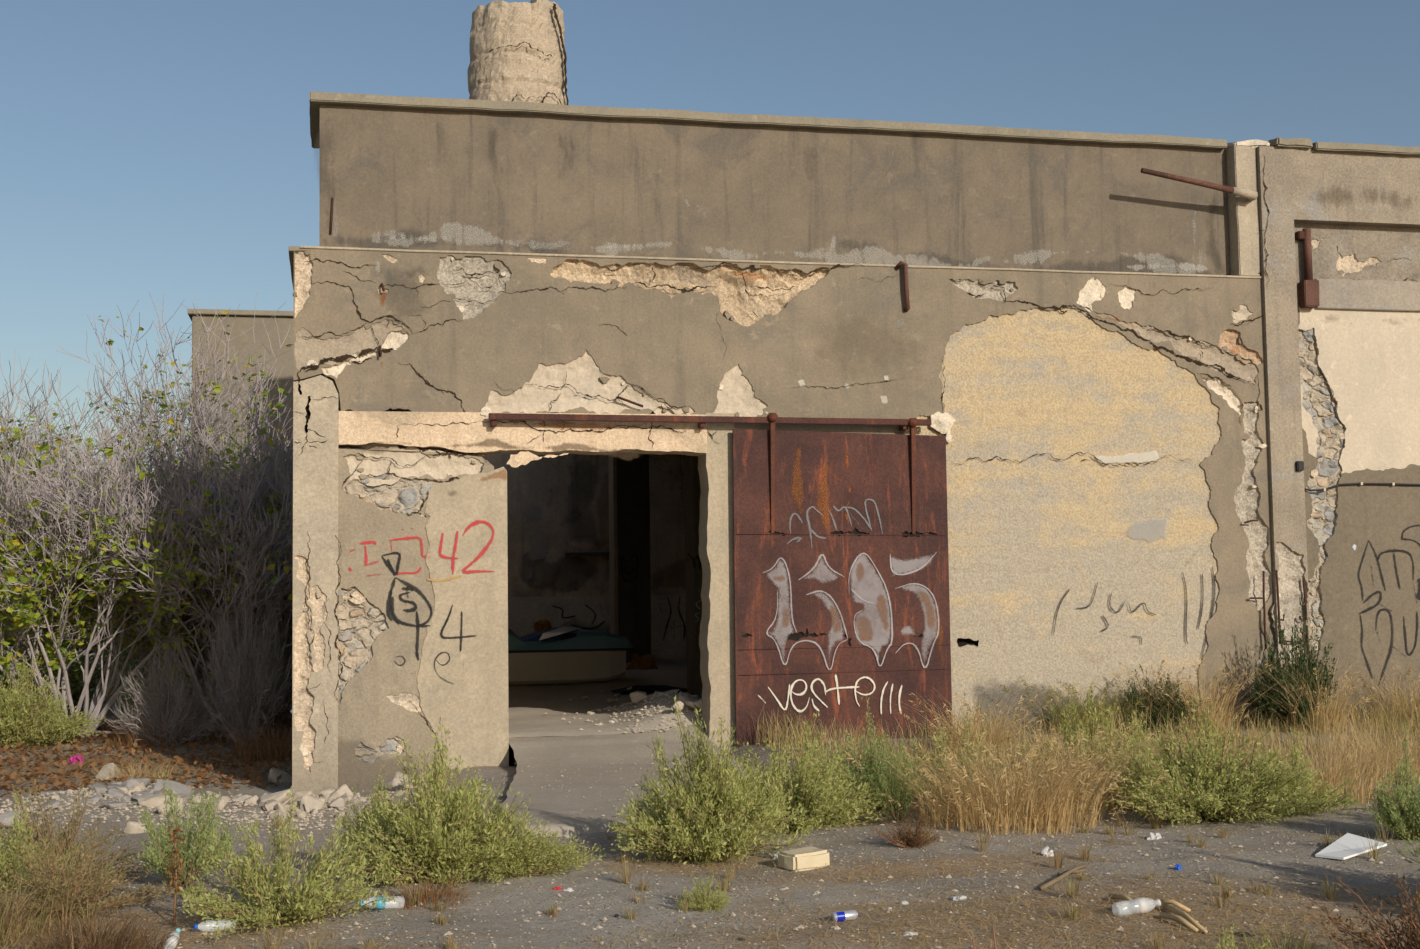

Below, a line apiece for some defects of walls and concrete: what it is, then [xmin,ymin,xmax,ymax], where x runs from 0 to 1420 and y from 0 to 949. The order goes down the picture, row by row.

spalling [419,255,512,319]
spalling [528,258,830,327]
spalling [1311,238,1382,276]
spalling [485,350,695,414]
crack [294,258,897,513]
spalling [713,364,768,417]
spalling [342,446,484,517]
crack [951,452,1196,466]
flaking render [903,276,1346,736]
crack [299,531,343,763]
spalling [290,555,389,773]